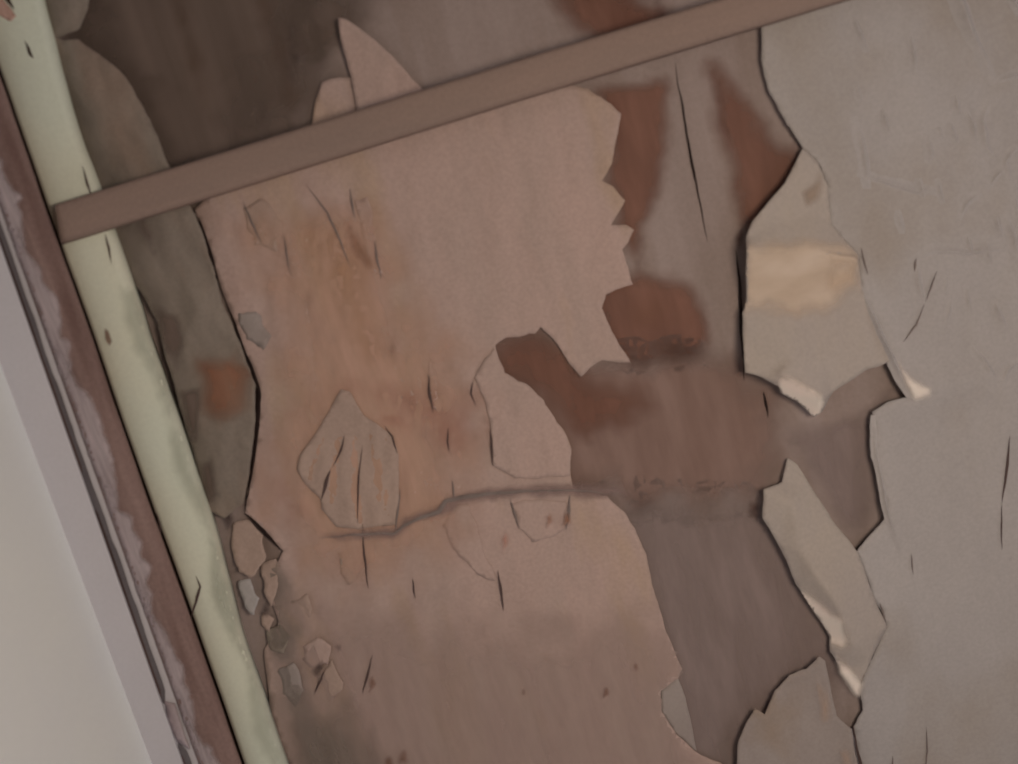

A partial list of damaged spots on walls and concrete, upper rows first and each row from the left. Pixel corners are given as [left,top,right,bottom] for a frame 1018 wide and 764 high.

peeling [0,0,16,21]
peeling [45,0,170,190]
peeling [312,18,423,124]
crack [675,65,707,238]
peeling [0,164,217,764]
peeling [116,85,722,764]
crack [426,375,434,409]
crack [319,438,622,588]
peeling [737,0,1018,764]